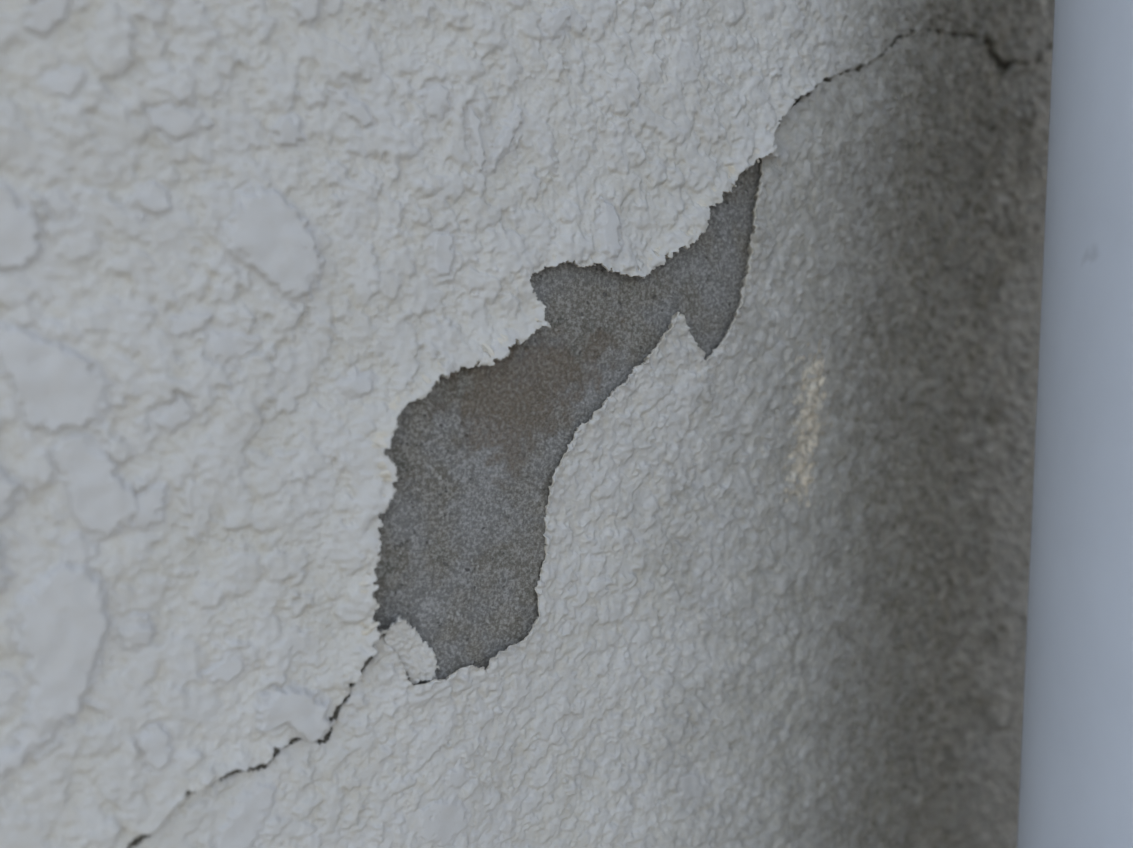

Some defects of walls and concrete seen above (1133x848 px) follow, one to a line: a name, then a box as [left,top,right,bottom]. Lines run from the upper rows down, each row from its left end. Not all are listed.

crack [777,27,1053,128]
peeling [352,138,779,700]